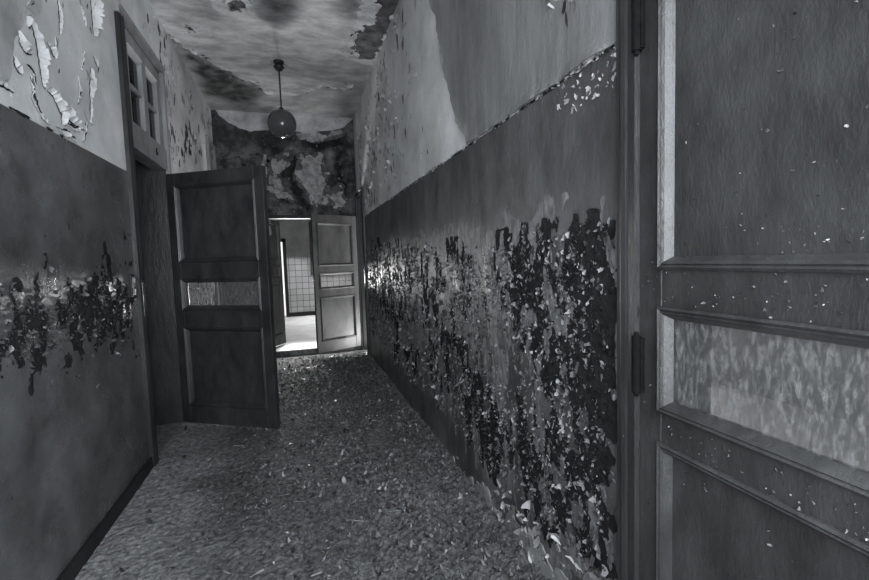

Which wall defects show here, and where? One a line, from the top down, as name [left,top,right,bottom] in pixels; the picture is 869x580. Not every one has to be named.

peeling [0,0,105,142]
peeling [0,240,140,396]
peeling [188,282,217,305]
peeling [366,192,618,580]